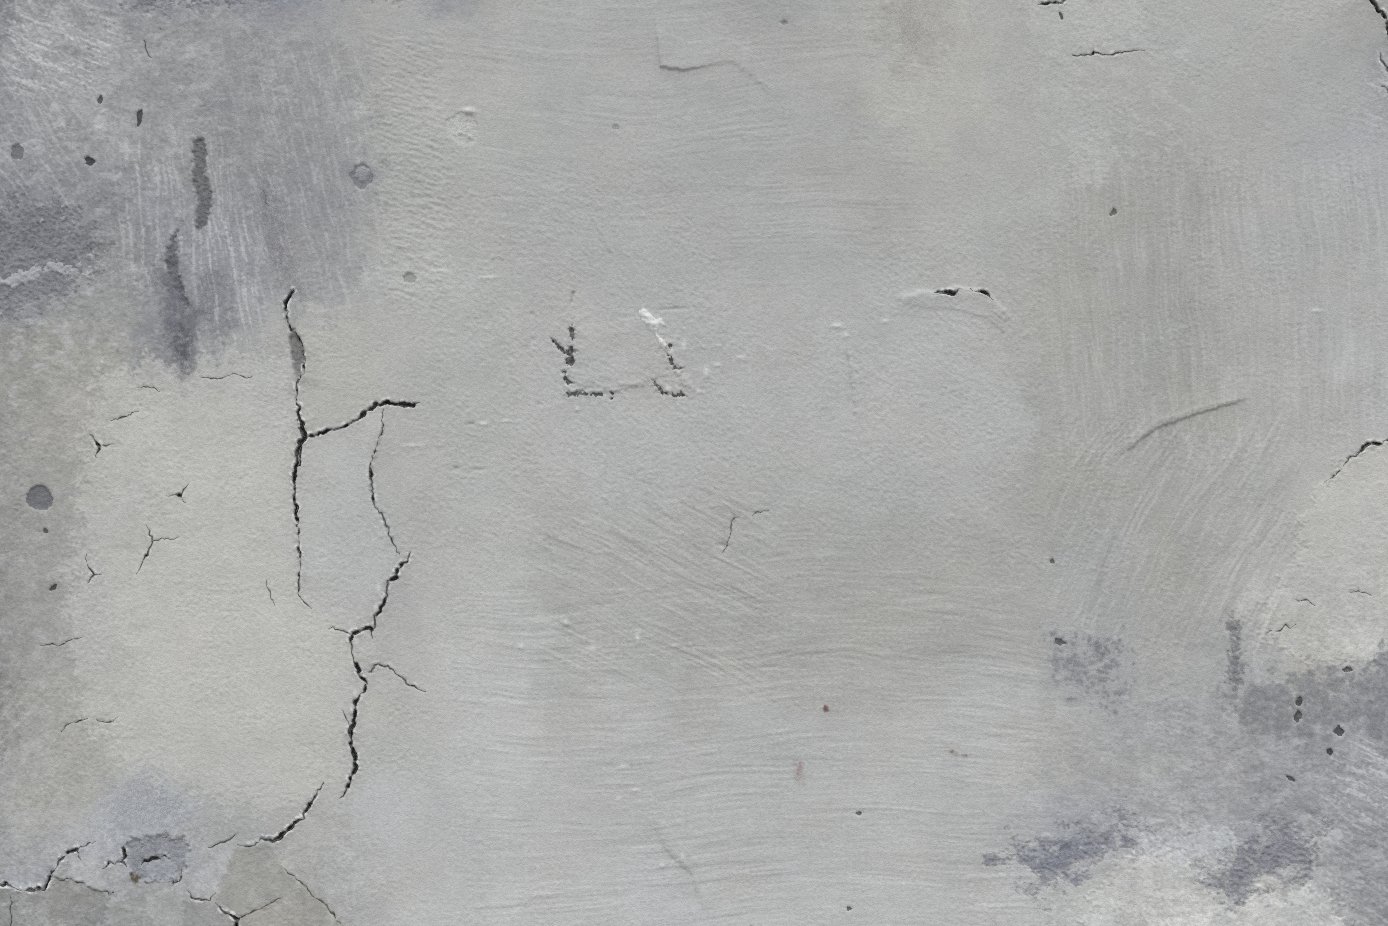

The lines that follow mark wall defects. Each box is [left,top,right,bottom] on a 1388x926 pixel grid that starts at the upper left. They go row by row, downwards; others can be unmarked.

crack [1041,0,1067,8]
crack [1074,49,1137,57]
crack [1370,0,1388,93]
flaking render [0,191,116,330]
crack [936,288,991,298]
crack [1326,439,1388,481]
crack [0,286,426,926]
flaking render [1224,610,1248,692]
spalling [1294,696,1303,723]
spalling [1327,725,1345,755]
flaking render [981,795,1152,920]
flaking render [1192,802,1334,911]